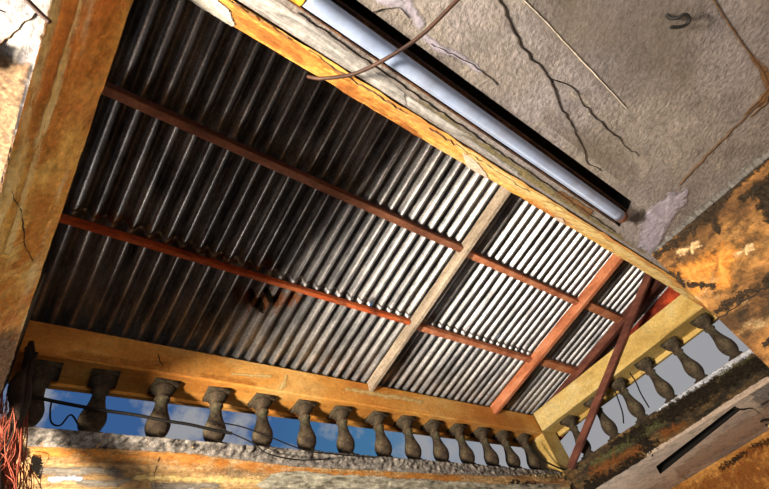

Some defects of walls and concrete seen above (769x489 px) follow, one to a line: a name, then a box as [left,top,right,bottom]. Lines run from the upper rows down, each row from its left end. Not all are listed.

crack [0,135,34,261]
crack [0,3,53,47]
leakage [0,0,83,254]
flaking render [190,0,235,27]
crack [229,0,615,232]
leakage [243,0,769,298]
crack [498,0,638,171]
flaking render [631,189,688,253]
corrosion [750,55,769,107]
leakage [714,273,769,316]
spalling [24,427,563,489]
leakage [562,349,769,489]